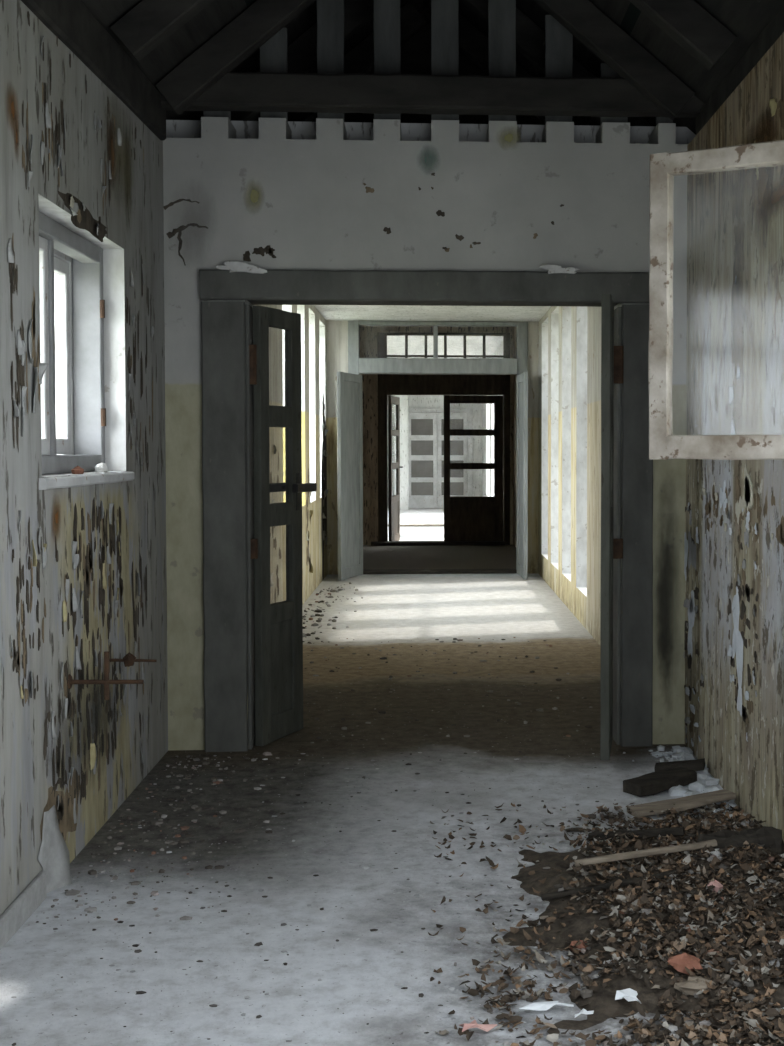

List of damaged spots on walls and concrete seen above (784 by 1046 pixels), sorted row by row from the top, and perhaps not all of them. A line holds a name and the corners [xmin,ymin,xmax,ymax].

flaking render [22,36,144,242]
crack [163,199,208,266]
peeling [7,236,49,452]
peeling [126,254,154,473]
peeling [11,510,58,707]
peeling [37,498,147,893]
peeling [683,463,784,747]